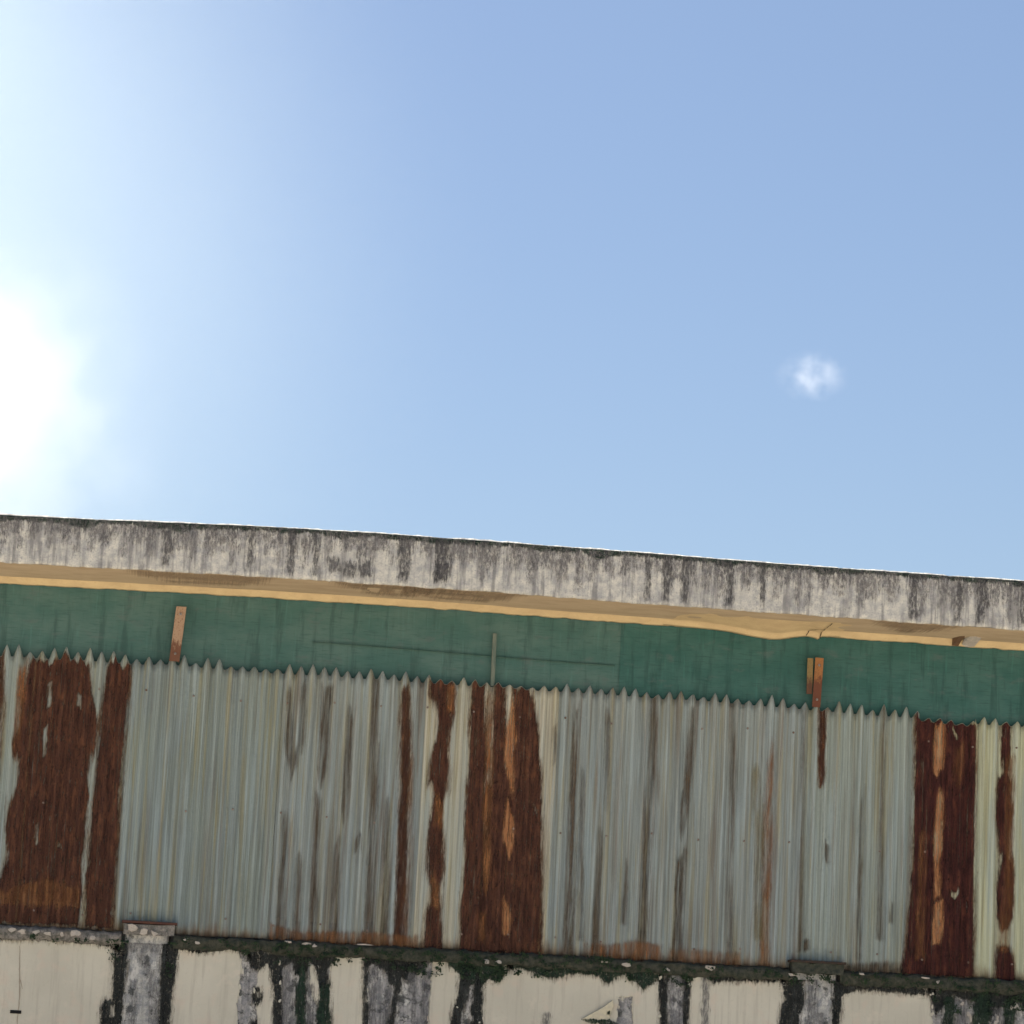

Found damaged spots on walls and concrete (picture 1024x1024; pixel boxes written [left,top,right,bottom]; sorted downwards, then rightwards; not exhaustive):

leakage [0,515,1024,624]
rust [0,652,131,930]
rust [270,679,455,949]
rust [459,681,544,955]
rust [853,712,978,978]
rust [994,722,1015,981]
leakage [96,942,335,1024]
leakage [361,958,431,1024]
leakage [448,962,1024,1024]